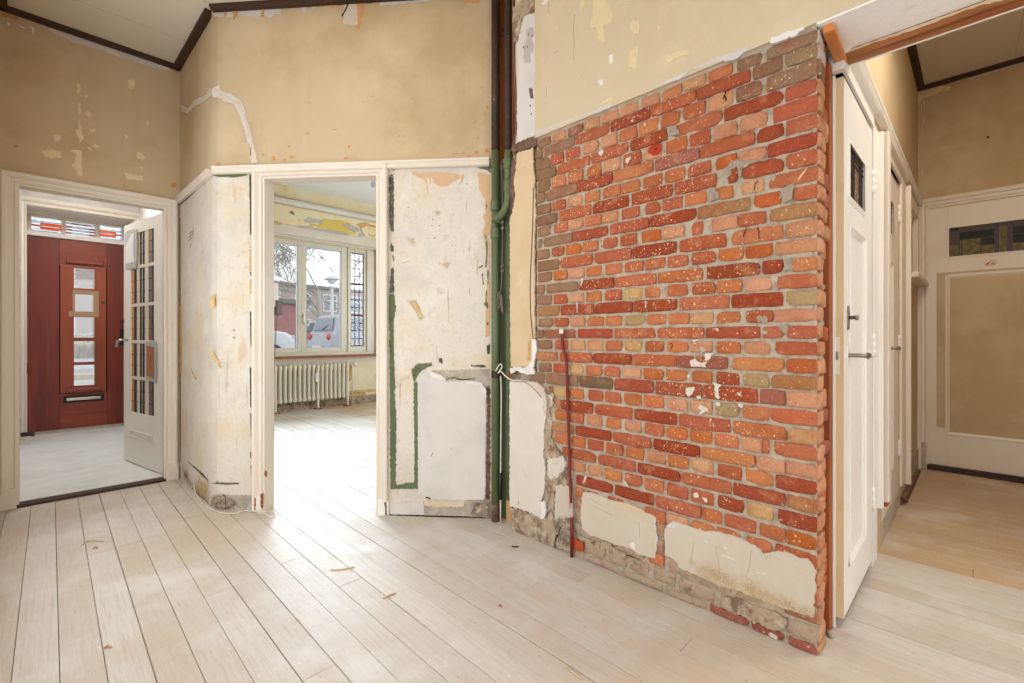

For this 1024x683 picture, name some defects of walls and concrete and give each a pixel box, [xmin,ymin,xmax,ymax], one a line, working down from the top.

peeling [41,83,100,176]
crack [180,84,258,164]
peeling [412,171,464,192]
peeling [290,211,376,237]
peeling [210,493,263,510]